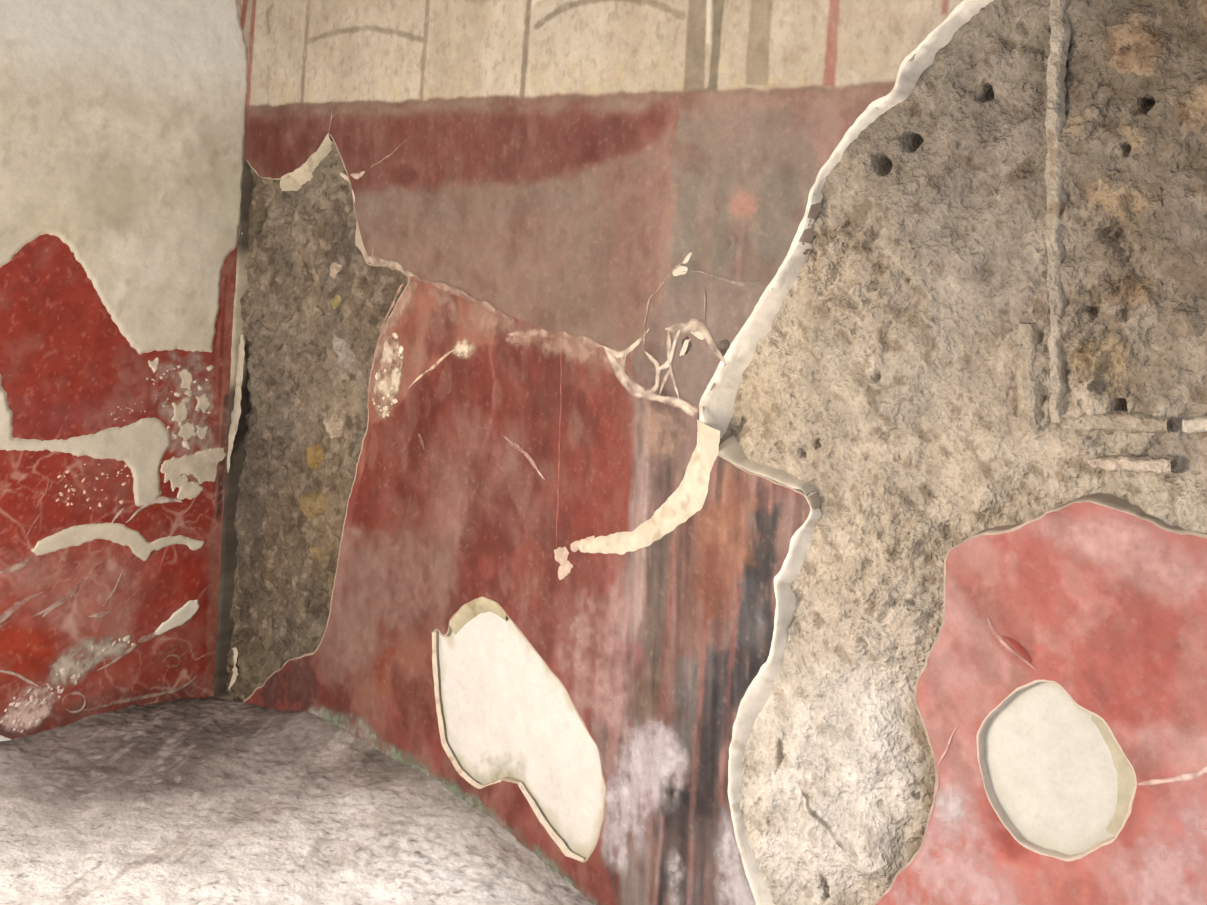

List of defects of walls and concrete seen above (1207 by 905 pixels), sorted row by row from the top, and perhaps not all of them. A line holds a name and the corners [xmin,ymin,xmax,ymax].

peeling [56,464,129,509]
spalling [146,132,515,702]
crack [554,252,761,580]
spalling [508,0,1207,905]
spalling [0,635,136,741]
flaking render [432,596,606,863]
water stain [606,725,686,868]
water stain [720,832,755,905]
water stain [914,797,999,905]
crack [1141,766,1207,785]